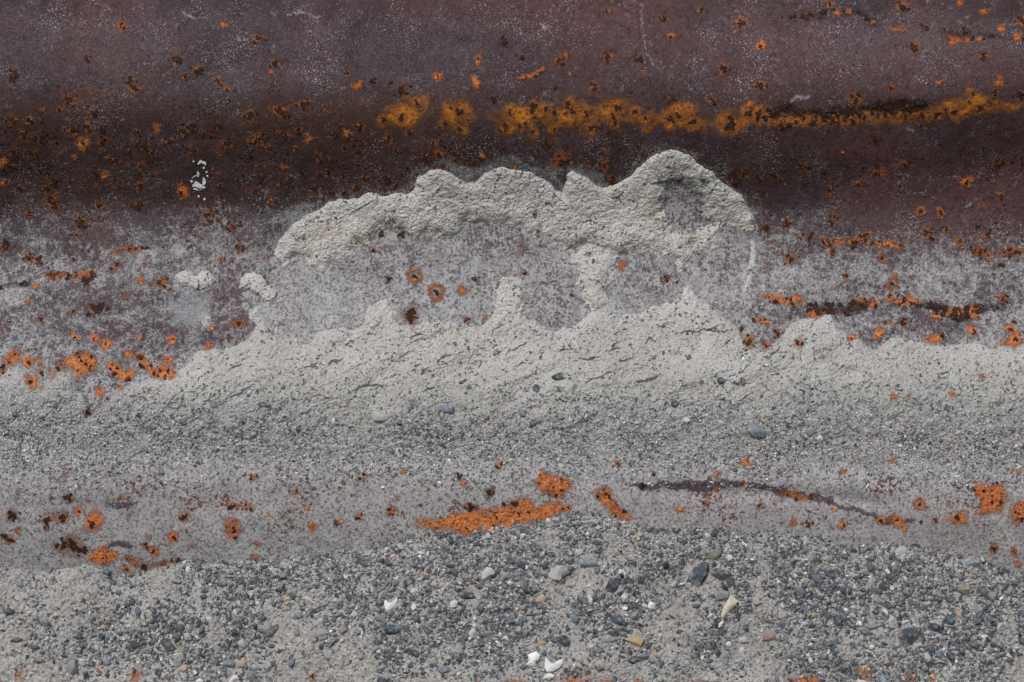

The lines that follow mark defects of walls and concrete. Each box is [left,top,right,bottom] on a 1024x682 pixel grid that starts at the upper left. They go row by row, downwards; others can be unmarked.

corrosion [709,76,1003,134]
corrosion [491,86,651,168]
corrosion [404,308,420,324]
corrosion [406,269,444,302]
corrosion [855,273,981,339]
corrosion [0,333,179,389]
corrosion [0,511,21,543]
corrosion [38,493,103,531]
corrosion [416,470,572,537]
corrosion [595,486,631,520]
corrosion [913,481,1024,524]
corrosion [54,531,183,574]